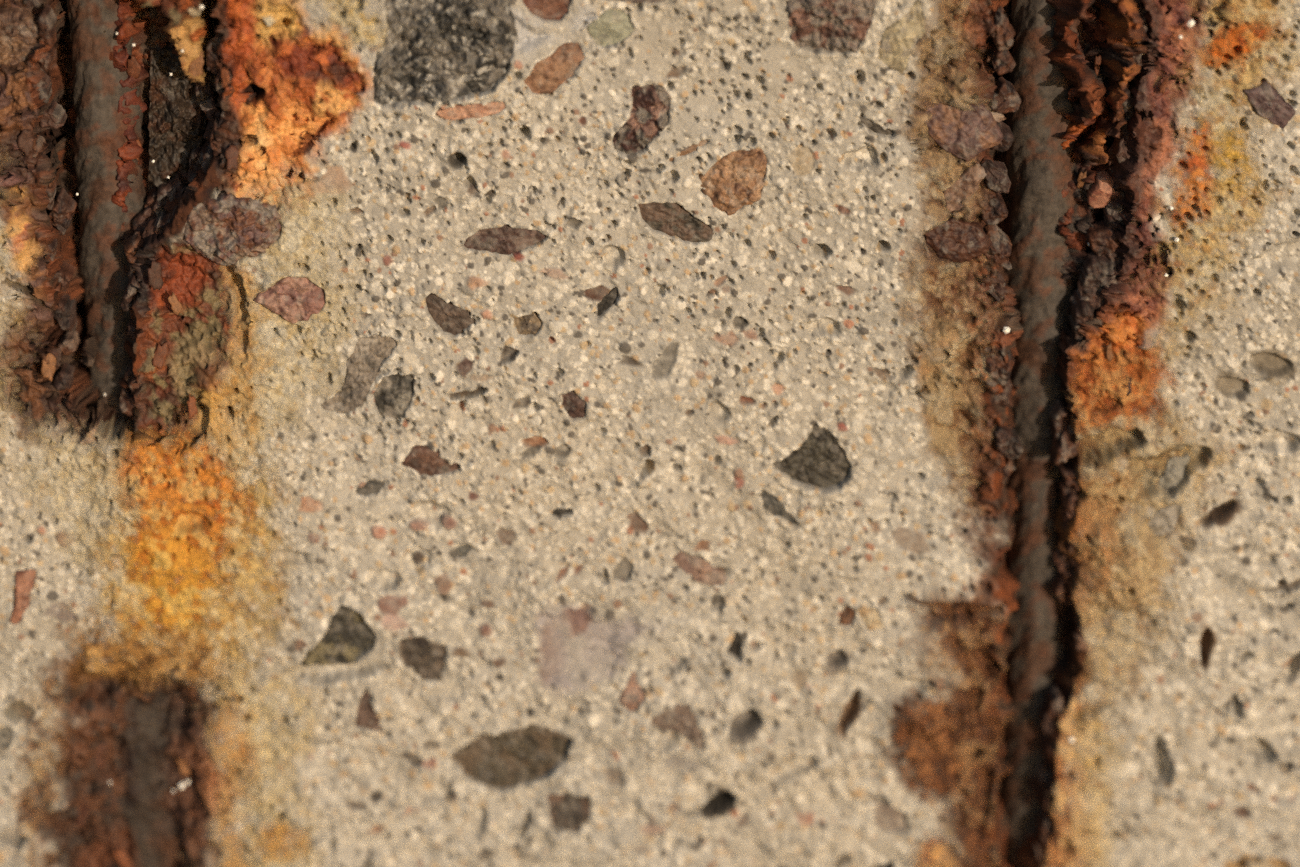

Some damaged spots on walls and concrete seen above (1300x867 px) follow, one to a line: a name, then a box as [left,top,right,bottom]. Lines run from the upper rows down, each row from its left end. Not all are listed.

spalling [0,0,372,455]
rust [25,185,350,684]
rust [327,0,385,44]
rust [909,263,974,481]
spalling [885,0,1235,867]
rust [1159,0,1292,325]
rust [17,712,61,832]
spalling [16,646,250,867]
rust [893,601,1005,867]
rust [1046,351,1227,867]